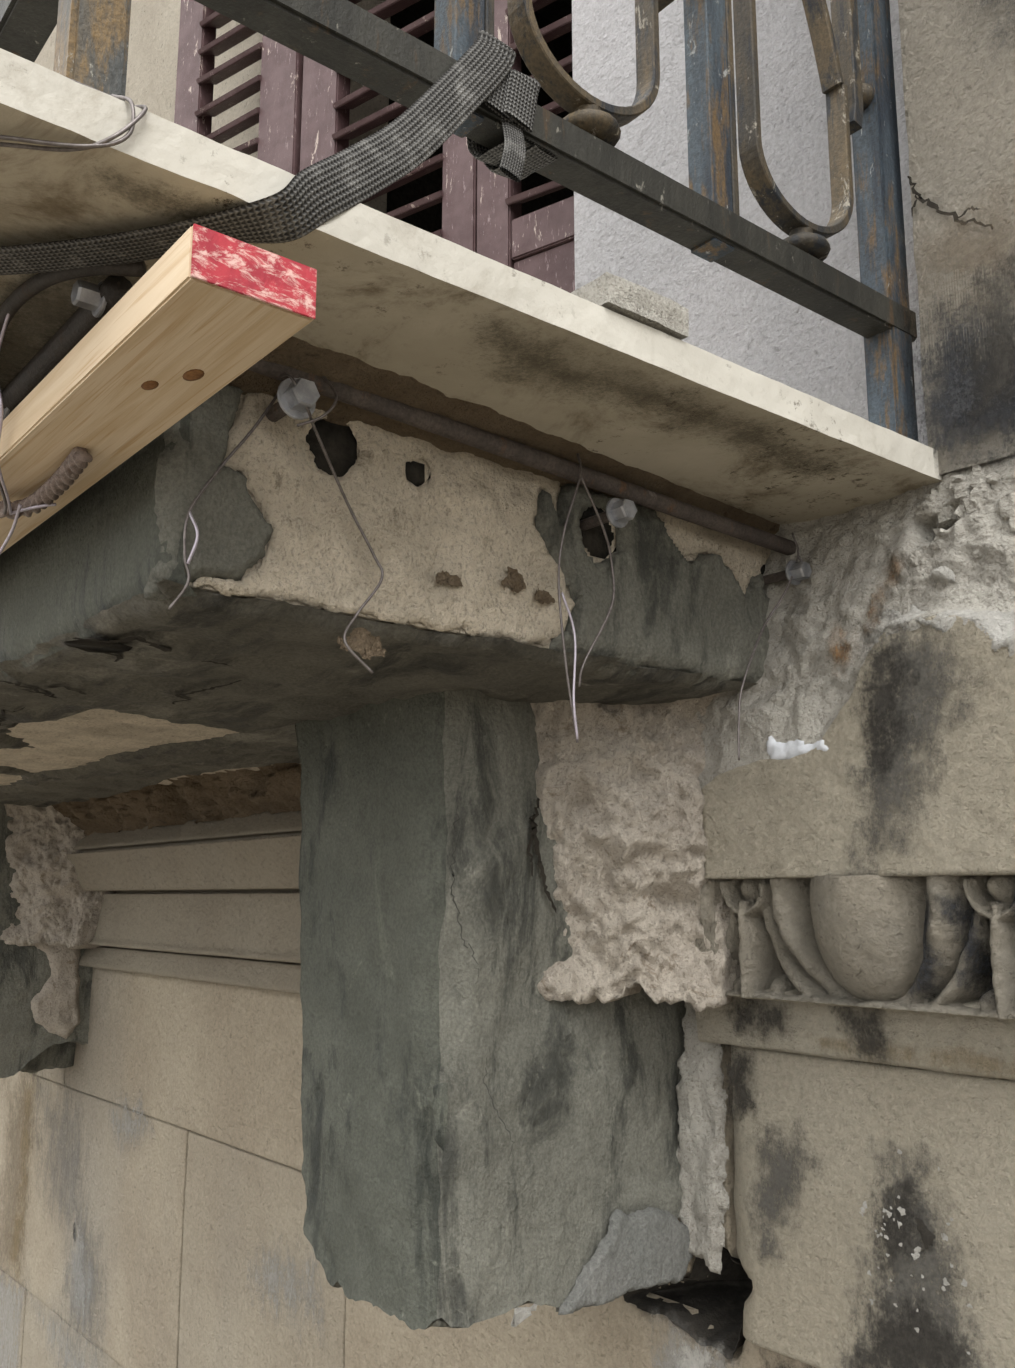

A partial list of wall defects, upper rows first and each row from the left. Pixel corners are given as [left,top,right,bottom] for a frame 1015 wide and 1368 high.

crack [907,176,993,230]
water stain [915,254,1015,460]
spalling [192,392,575,660]
spalling [655,510,771,594]
flaking render [865,604,1015,657]
flaking render [931,566,955,583]
spalling [0,709,238,786]
water stain [850,622,971,874]
flaking render [0,763,301,1039]
flaking render [530,693,753,1360]
spalling [511,1304,537,1327]
water stain [843,1141,990,1368]